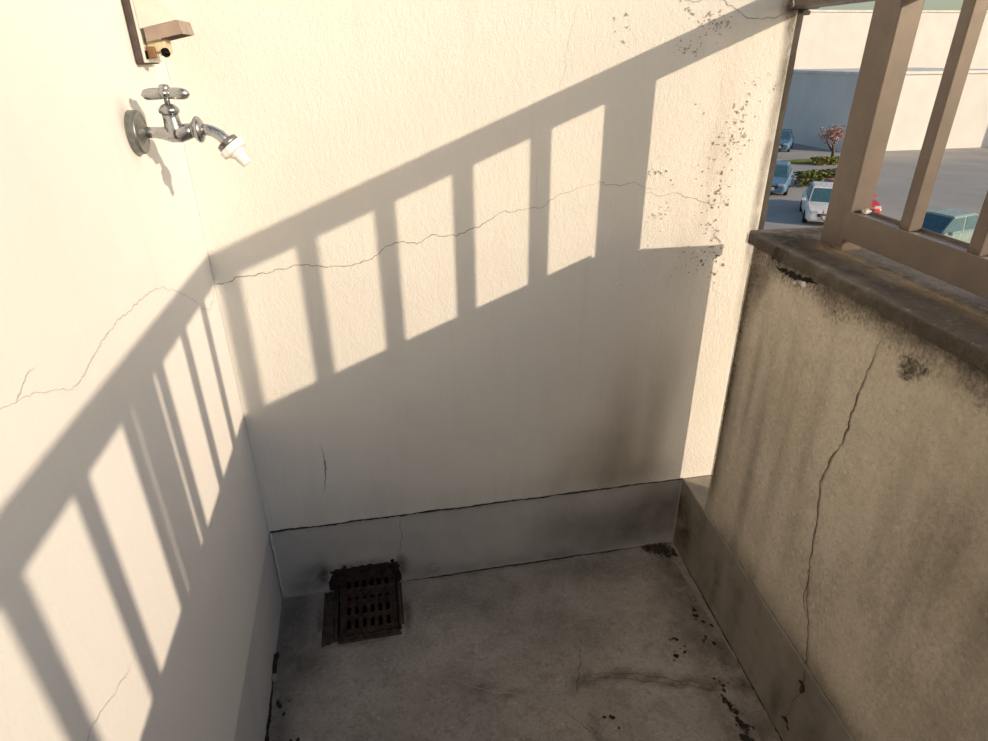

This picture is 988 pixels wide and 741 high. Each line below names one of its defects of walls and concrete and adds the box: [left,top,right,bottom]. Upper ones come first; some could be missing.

crack [685,0,783,20]
crack [1,161,712,409]
leakage [899,353,928,381]
crack [786,338,882,715]